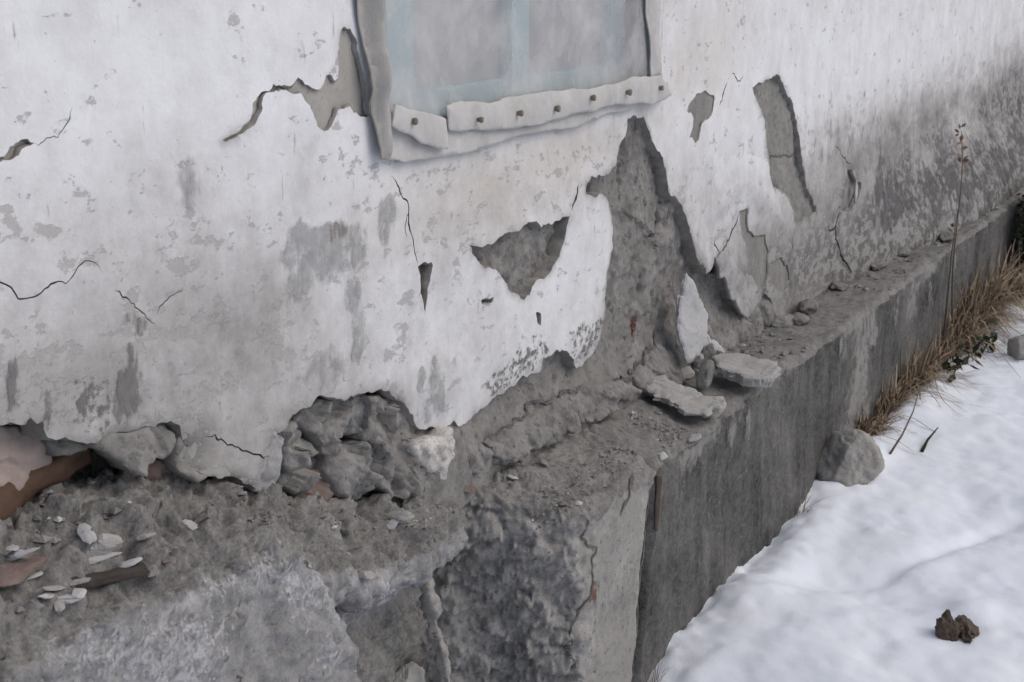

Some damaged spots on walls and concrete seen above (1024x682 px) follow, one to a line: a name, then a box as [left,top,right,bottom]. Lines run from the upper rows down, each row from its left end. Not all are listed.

spalling [222,27,369,142]
spalling [687,90,715,143]
spalling [753,74,816,224]
water stain [858,97,1024,235]
crack [0,260,101,300]
crack [115,287,184,324]
spalling [0,115,790,511]
crack [394,179,418,262]
crack [828,211,852,273]
crack [205,434,267,459]
crack [558,515,598,680]